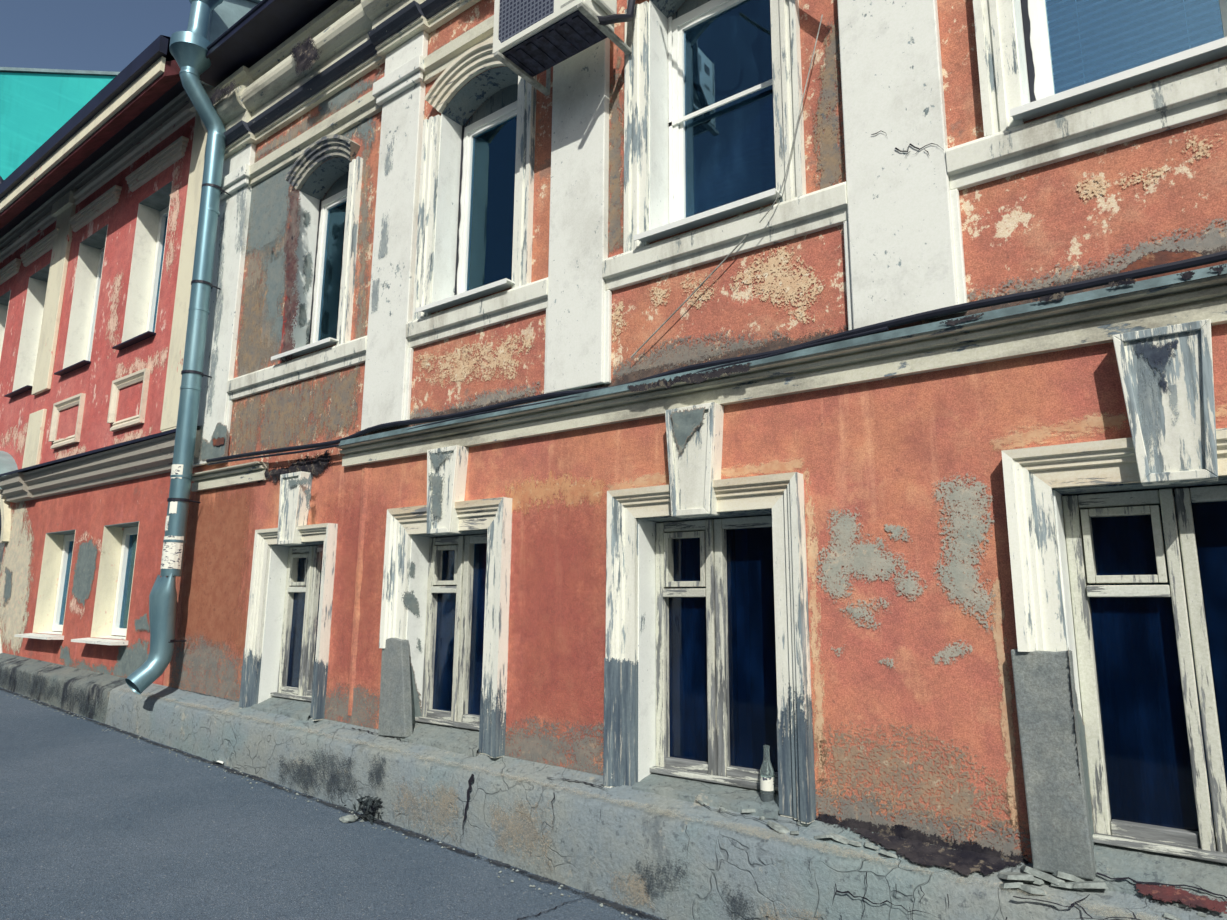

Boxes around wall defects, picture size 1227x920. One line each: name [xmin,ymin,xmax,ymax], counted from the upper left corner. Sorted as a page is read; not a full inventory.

flaking render [255,73,379,162]
flaking render [341,116,394,339]
flaking render [967,218,1227,300]
peeling [1075,167,1174,204]
peeling [200,162,360,461]
peeling [611,242,826,379]
peeling [410,332,540,419]
peeling [814,473,997,632]
peeling [603,657,638,787]
crack [460,774,474,843]
crack [809,861,949,920]
crack [1006,872,1227,920]